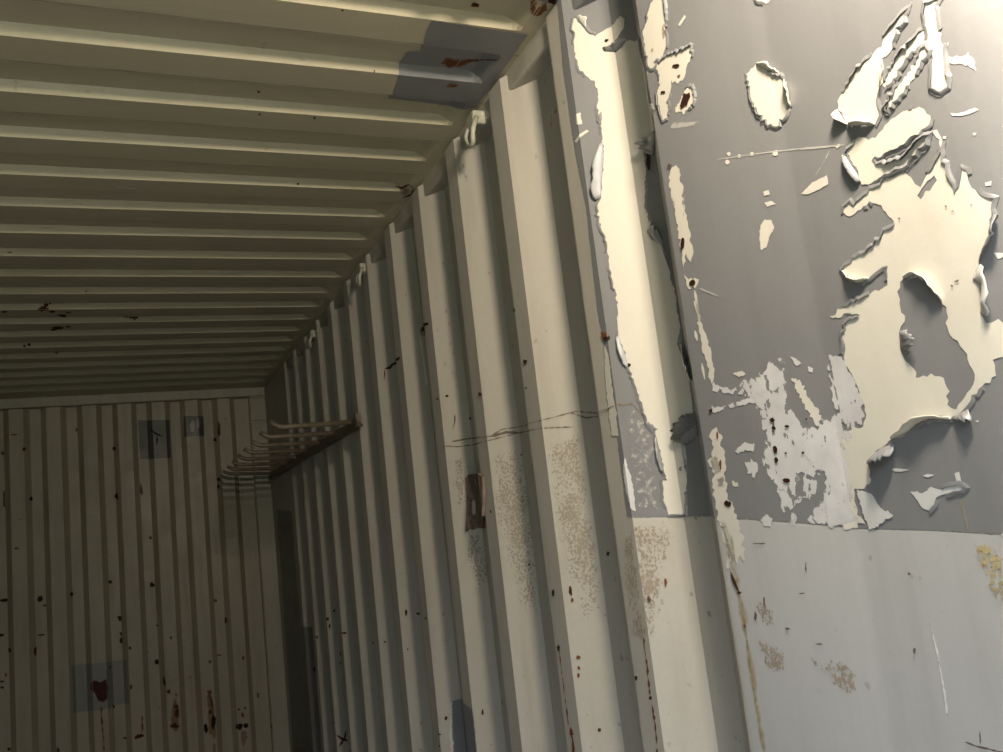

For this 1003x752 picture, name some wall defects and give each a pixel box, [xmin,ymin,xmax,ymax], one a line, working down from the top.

rust [530,0,558,16]
rust [442,58,497,68]
peeling [745,61,792,130]
peeling [569,0,698,517]
peeling [759,220,774,250]
peeling [802,0,1003,530]
rust [91,680,108,751]
rust [163,676,180,731]
rust [204,690,216,737]